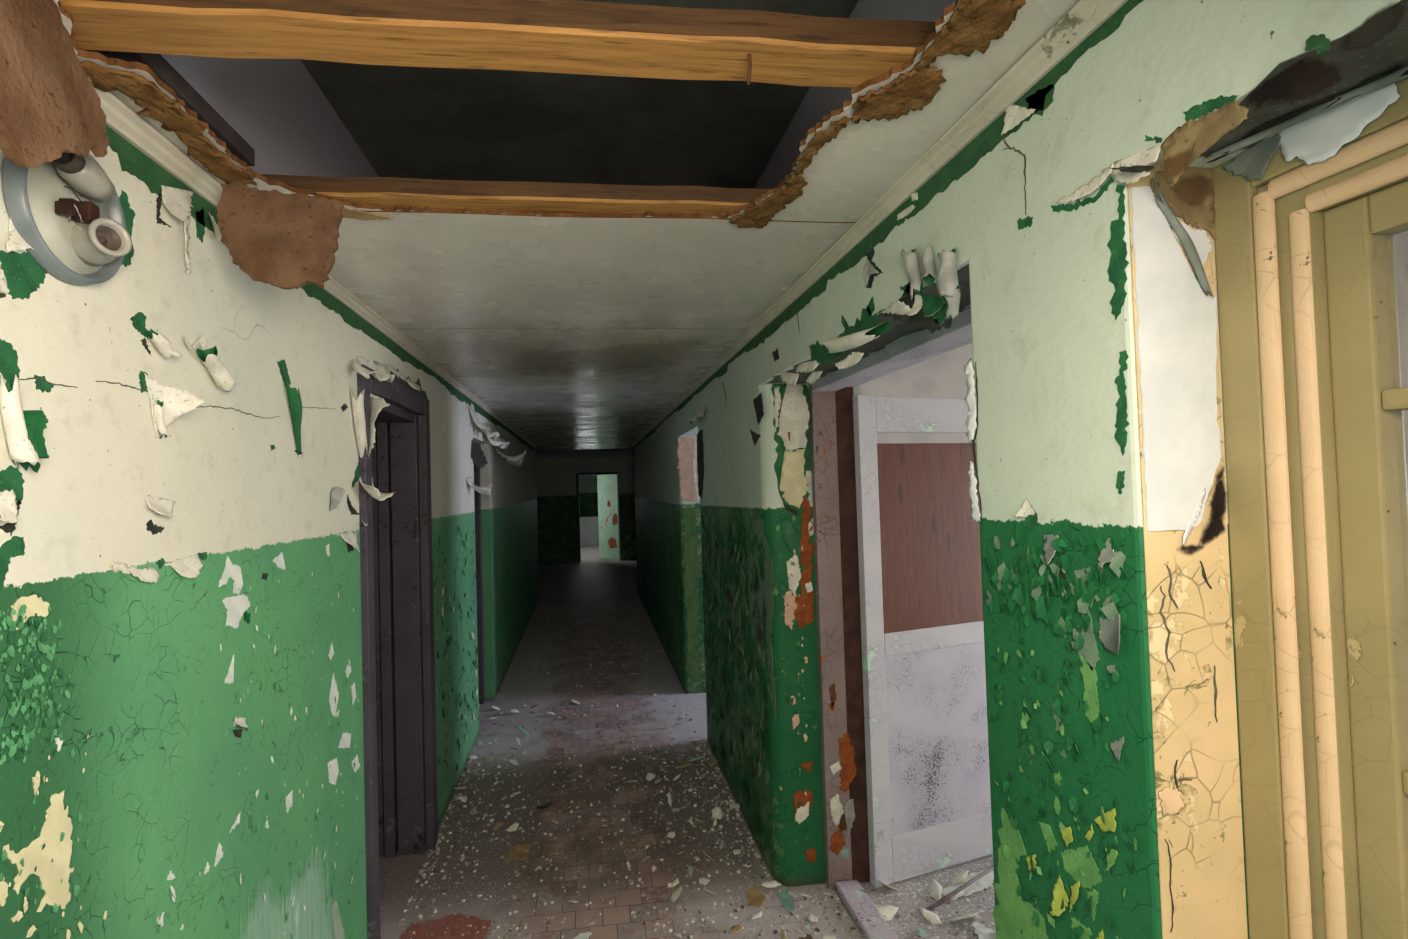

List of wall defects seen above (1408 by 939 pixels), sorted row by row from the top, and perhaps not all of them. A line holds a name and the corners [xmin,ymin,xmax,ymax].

peeling [0,218,47,300]
peeling [0,338,54,589]
crack [19,378,148,392]
peeling [106,125,222,274]
crack [196,405,335,419]
peeling [277,360,303,458]
peeling [301,283,535,556]
peeling [634,0,1144,729]
peeling [1051,65,1408,545]
flaking render [11,594,50,630]
flaking render [0,772,73,938]
peeling [941,807,1118,939]